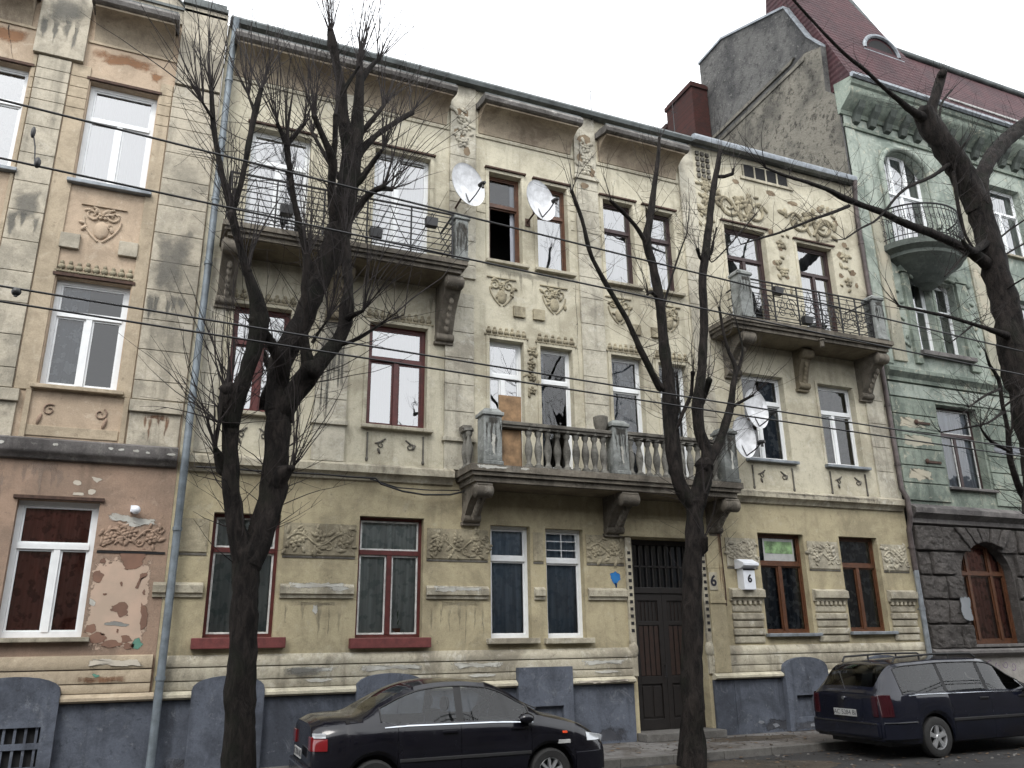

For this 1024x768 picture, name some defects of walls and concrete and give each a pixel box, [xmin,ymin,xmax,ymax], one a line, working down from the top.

damp [41,0,79,46]
damp [8,195,37,232]
peeling [72,477,103,495]
peeling [83,549,151,683]